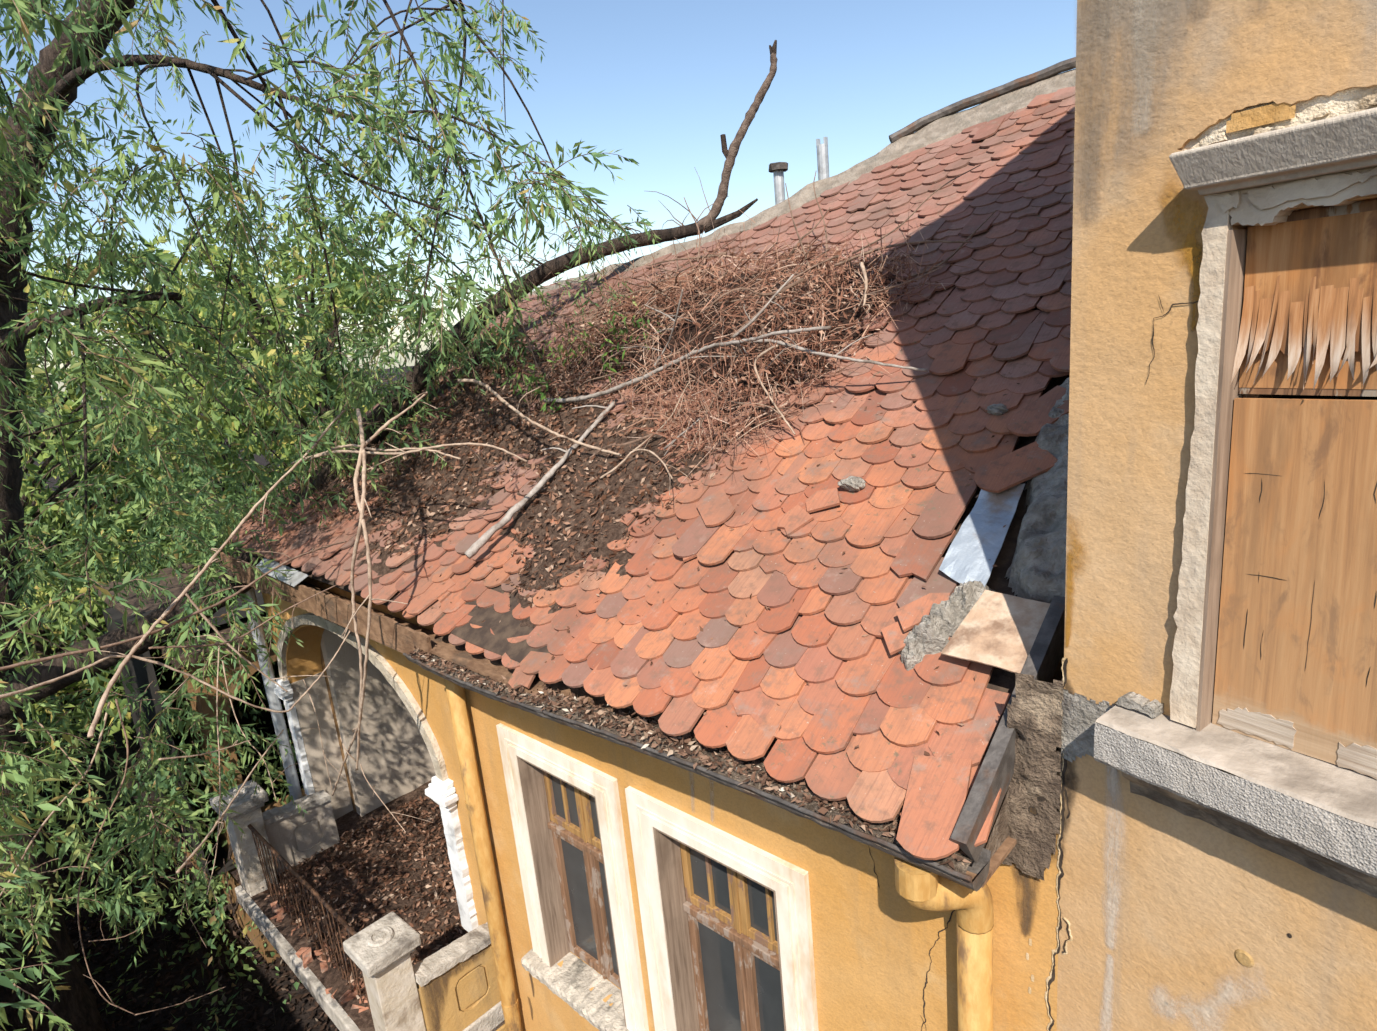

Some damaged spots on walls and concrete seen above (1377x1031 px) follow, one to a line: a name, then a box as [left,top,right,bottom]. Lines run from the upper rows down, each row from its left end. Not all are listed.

flaking render [1179,85,1377,151]
flaking render [1207,166,1377,226]
crack [1146,295,1199,382]
crack [1060,657,1068,708]
crack [1044,752,1073,1031]
crack [920,910,955,1031]